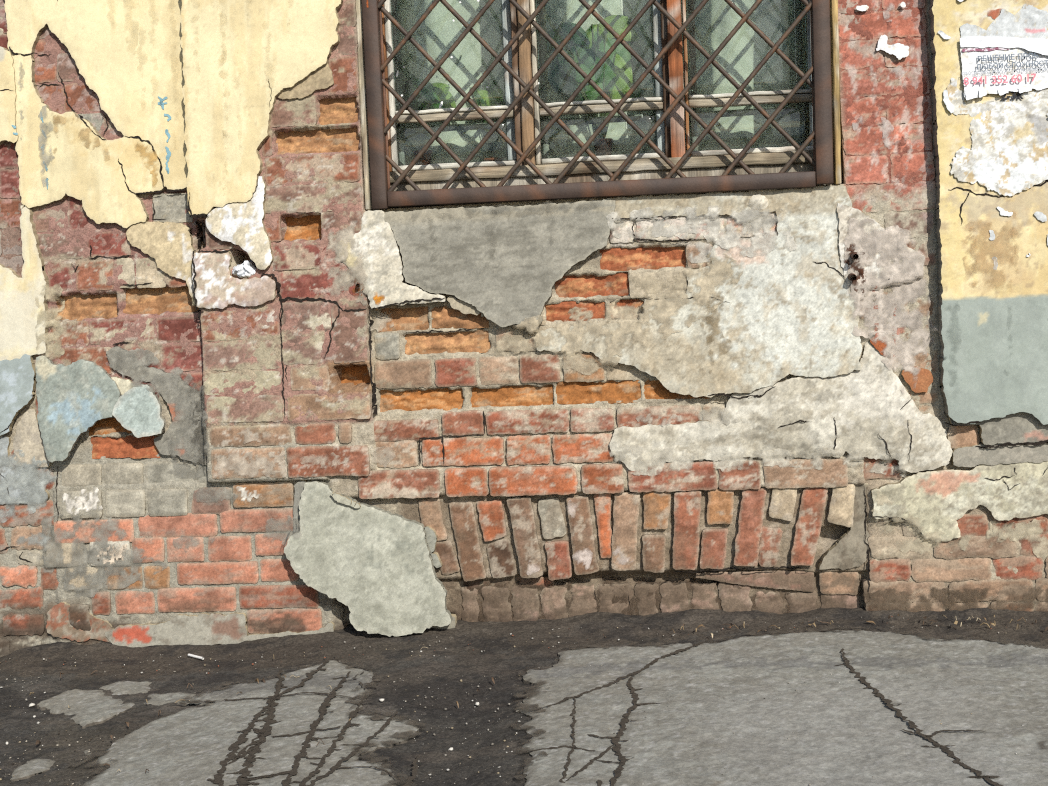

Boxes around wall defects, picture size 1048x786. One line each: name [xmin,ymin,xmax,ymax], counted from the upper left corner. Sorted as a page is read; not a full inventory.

spalling [34,27,124,138]
crack [0,46,231,331]
spalling [270,0,359,127]
spalling [838,0,936,265]
spalling [0,127,1048,656]